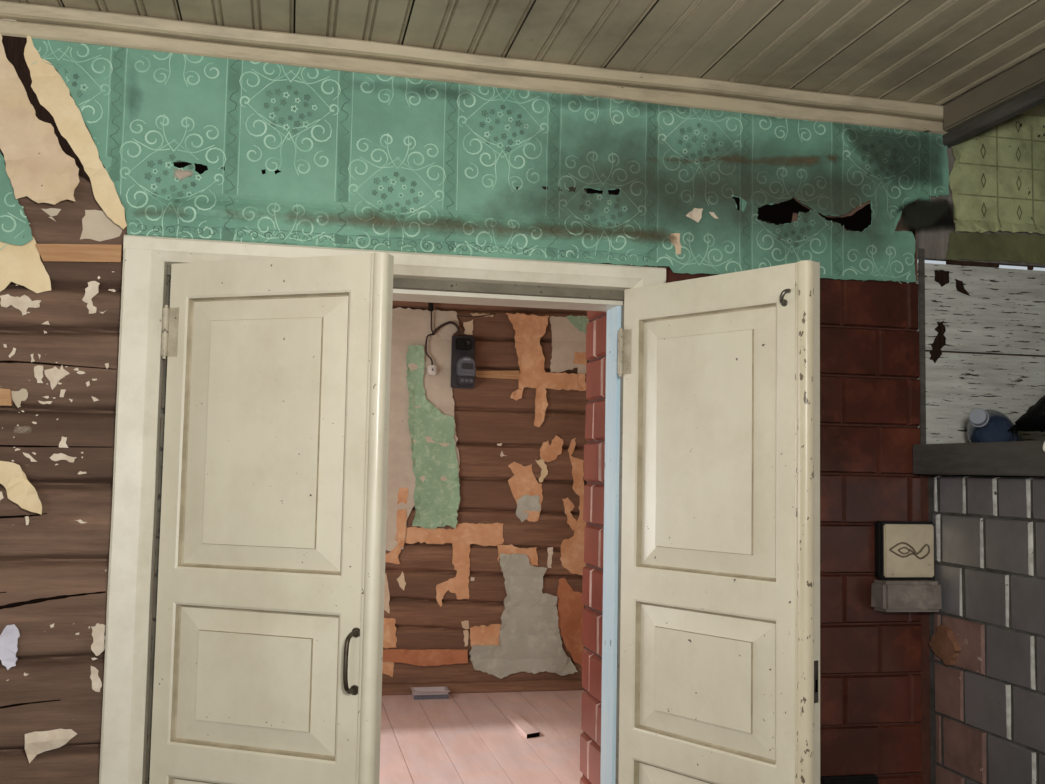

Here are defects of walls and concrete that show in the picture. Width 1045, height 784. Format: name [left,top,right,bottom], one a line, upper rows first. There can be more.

water stain [849,129,937,180]
water stain [587,155,863,221]
peeling [42,208,61,221]
peeling [934,270,970,296]
peeling [930,321,946,363]
peeling [31,354,43,383]
peeling [90,666,102,692]